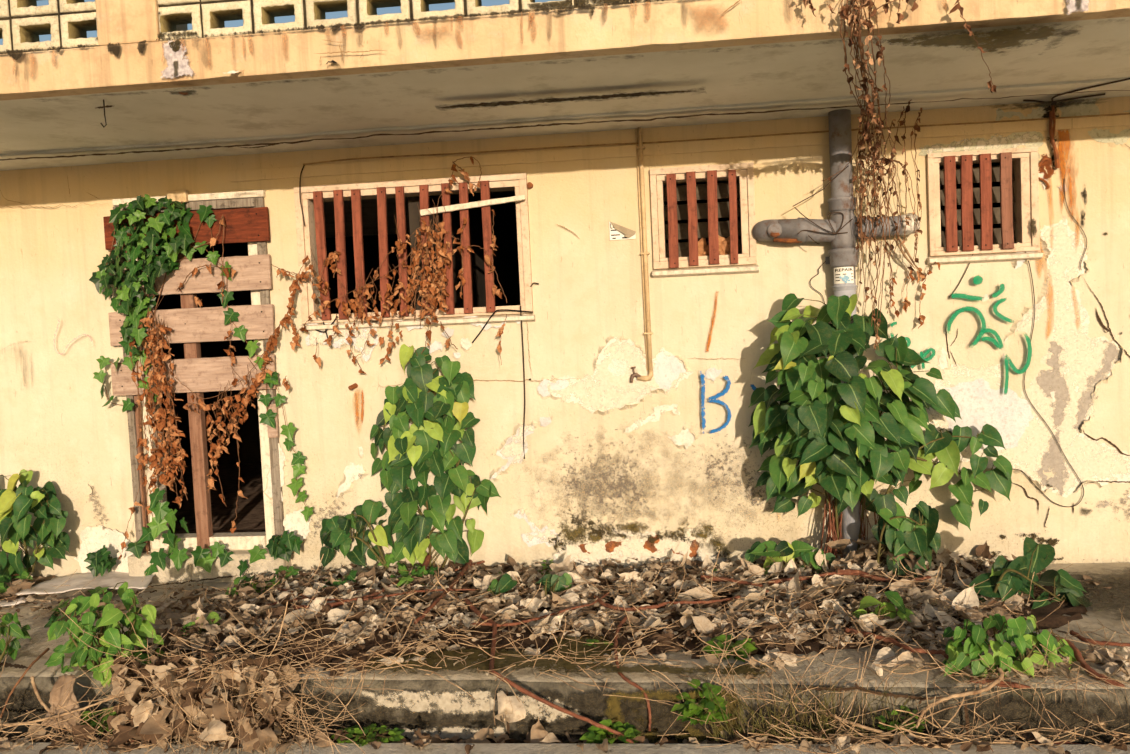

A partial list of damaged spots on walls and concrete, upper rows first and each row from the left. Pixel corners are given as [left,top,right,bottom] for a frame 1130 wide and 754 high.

rust [1038,129,1079,235]
rust [355,391,364,421]
peeling [305,318,424,362]
peeling [426,313,531,361]
peeling [529,335,722,450]
peeling [927,216,1130,498]
crack [1084,279,1130,357]
peeling [335,446,369,499]
peeling [489,417,551,482]
mould [548,437,730,559]
mould [694,438,770,512]